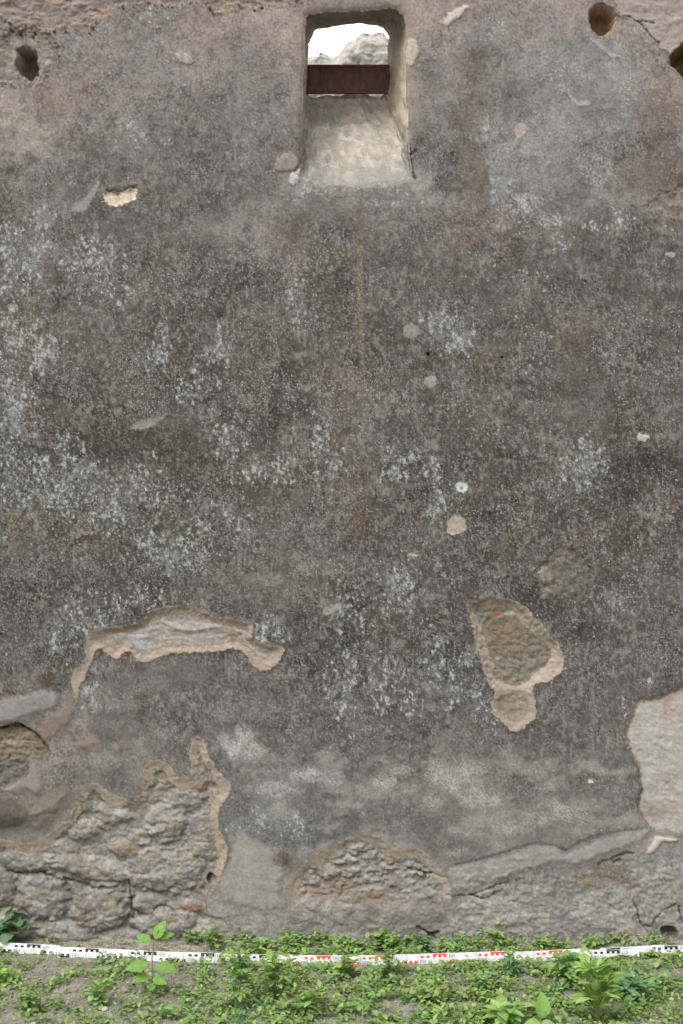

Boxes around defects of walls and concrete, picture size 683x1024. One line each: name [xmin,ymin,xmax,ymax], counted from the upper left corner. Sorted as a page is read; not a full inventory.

flaking render [0,0,305,88]
flaking render [54,175,137,212]
flaking render [70,605,285,703]
flaking render [467,594,564,732]
flaking render [0,725,50,790]
flaking render [623,685,683,854]
flaking render [0,736,235,943]
flaking render [285,832,453,929]
crack [452,881,509,899]
crack [408,829,633,877]
crack [634,903,683,927]